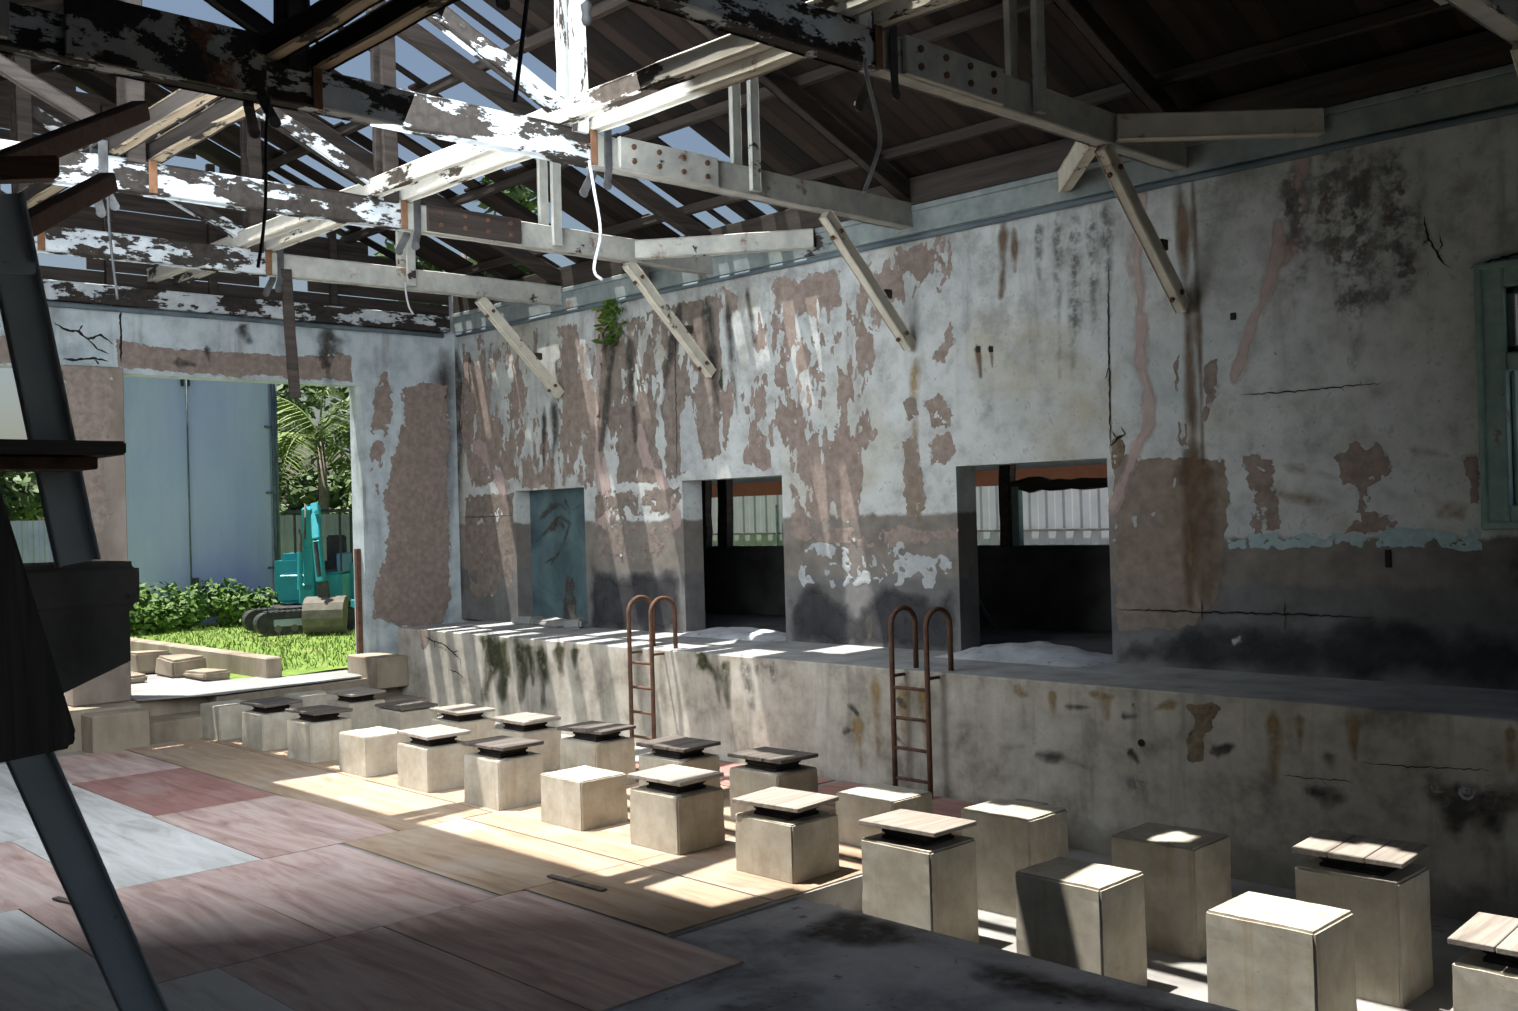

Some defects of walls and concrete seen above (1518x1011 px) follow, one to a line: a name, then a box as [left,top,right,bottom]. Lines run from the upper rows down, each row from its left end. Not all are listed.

rust [1177,194,1197,267]
water stain [1282,160,1420,304]
crack [54,312,122,364]
peeling [369,235,959,627]
peeling [1111,359,1281,633]
rust [1182,289,1213,605]
peeling [1333,441,1398,535]
water stain [1130,621,1518,683]
water stain [1432,782,1518,829]